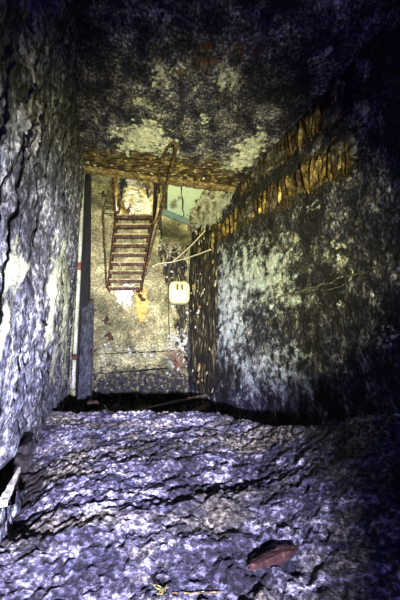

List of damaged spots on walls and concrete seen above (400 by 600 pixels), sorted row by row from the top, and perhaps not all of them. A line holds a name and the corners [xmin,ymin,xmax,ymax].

corrosion [134,287,149,322]
flaking render [80,76,375,397]
damp [216,239,311,403]
crack [232,261,400,313]